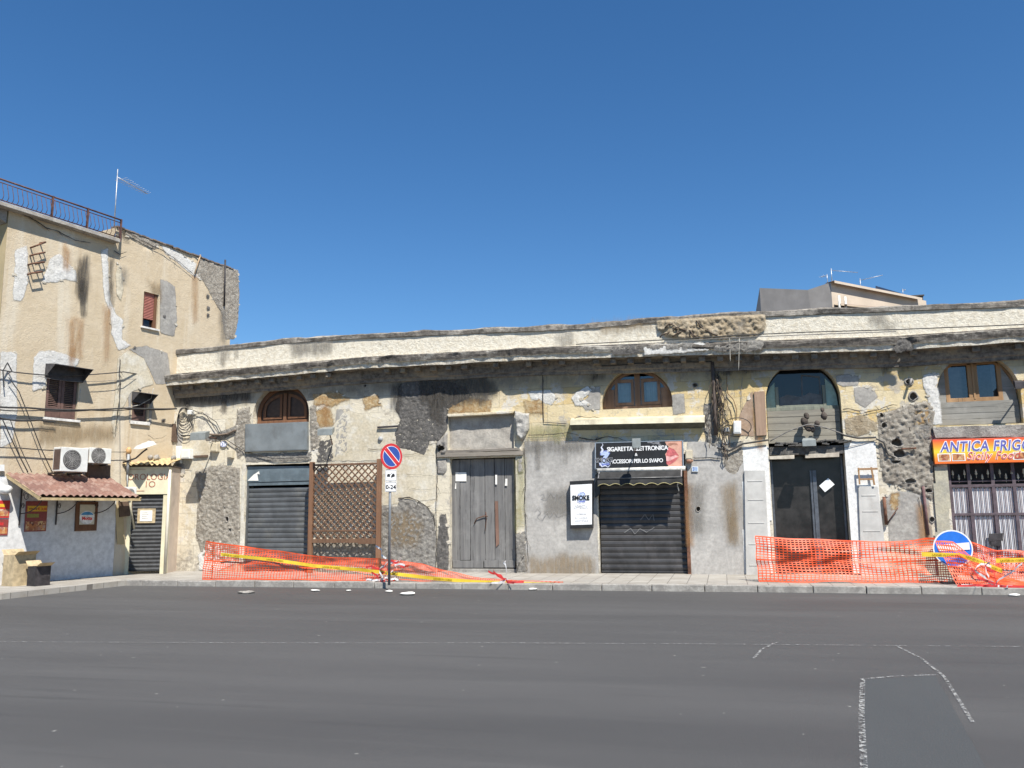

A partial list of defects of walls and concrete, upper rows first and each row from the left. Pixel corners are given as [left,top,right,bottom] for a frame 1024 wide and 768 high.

peeling [12,246,29,301]
peeling [42,254,78,284]
leakage [78,256,89,314]
peeling [125,231,240,340]
peeling [101,248,170,438]
peeling [0,351,18,447]
peeling [362,395,381,410]
peeling [393,380,491,455]
peeling [176,391,349,571]
peeling [836,371,942,546]
peeling [313,499,452,573]